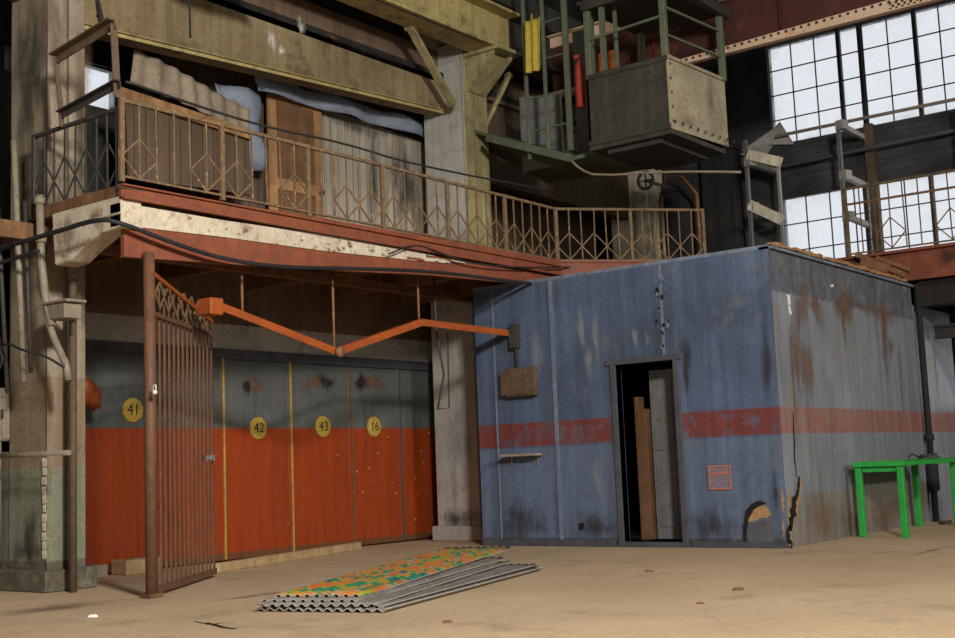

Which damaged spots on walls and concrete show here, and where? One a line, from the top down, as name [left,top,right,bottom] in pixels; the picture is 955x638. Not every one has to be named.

spalling [743,491,785,542]